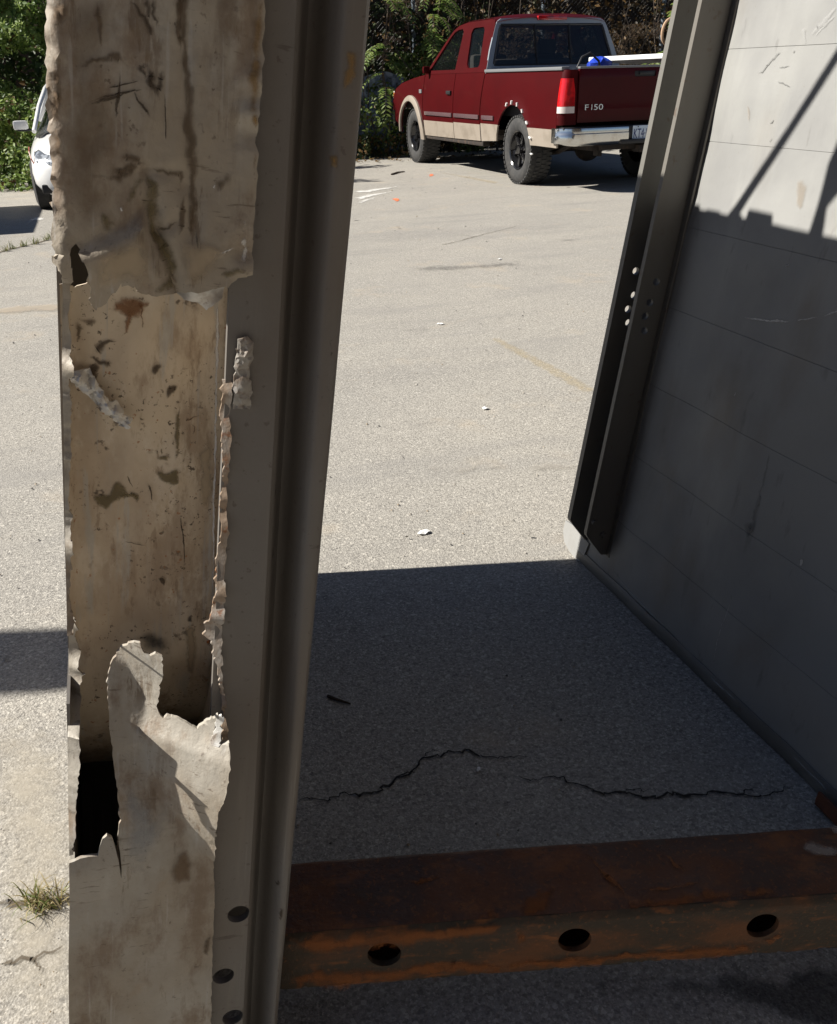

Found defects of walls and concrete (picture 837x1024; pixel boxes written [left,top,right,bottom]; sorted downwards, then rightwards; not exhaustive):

damp [96,66,163,116]
rust [115,299,148,333]
peeling [232,336,254,410]
peeling [70,368,133,429]
peeling [210,714,224,747]
crack [303,749,785,801]
rust [304,927,497,951]